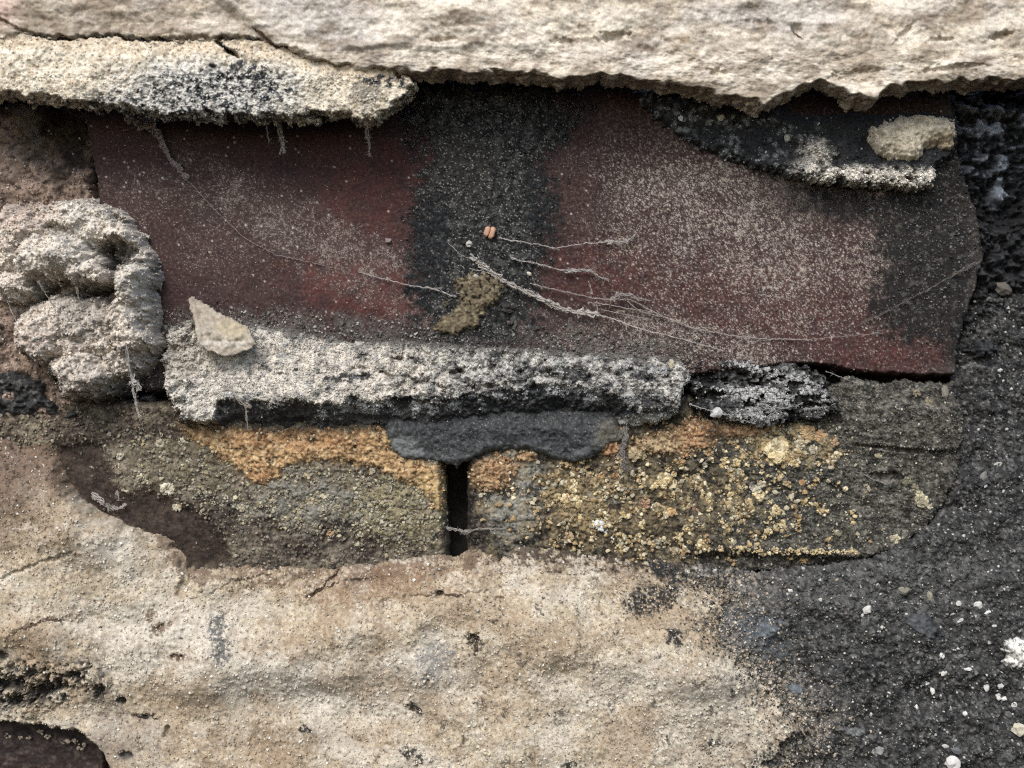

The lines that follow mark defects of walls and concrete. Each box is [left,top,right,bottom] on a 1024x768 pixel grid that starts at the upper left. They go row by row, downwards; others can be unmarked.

peeling [188,296,257,357]
spalling [55,439,230,571]
leakage [104,427,448,561]
efflorescence [467,418,901,566]
efflorescence [900,465,933,510]
leakage [725,605,790,661]